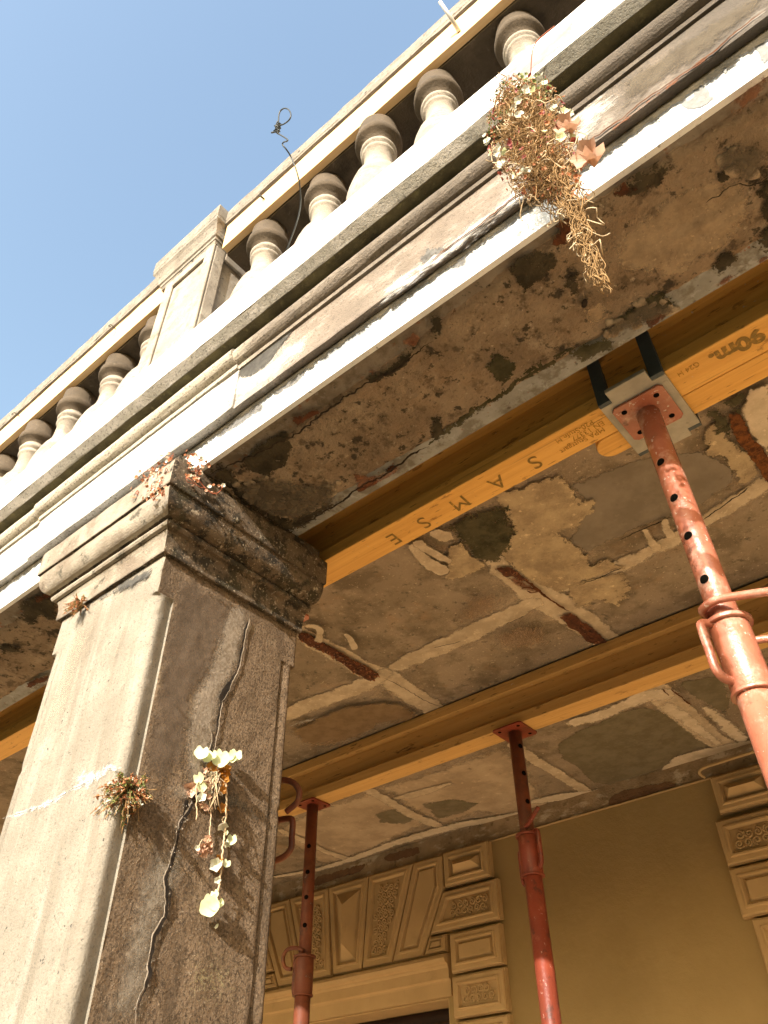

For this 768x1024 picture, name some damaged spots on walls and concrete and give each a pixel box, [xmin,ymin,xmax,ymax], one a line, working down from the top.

crack [205,342,431,477]
crack [302,447,426,526]
crack [132,618,250,1024]